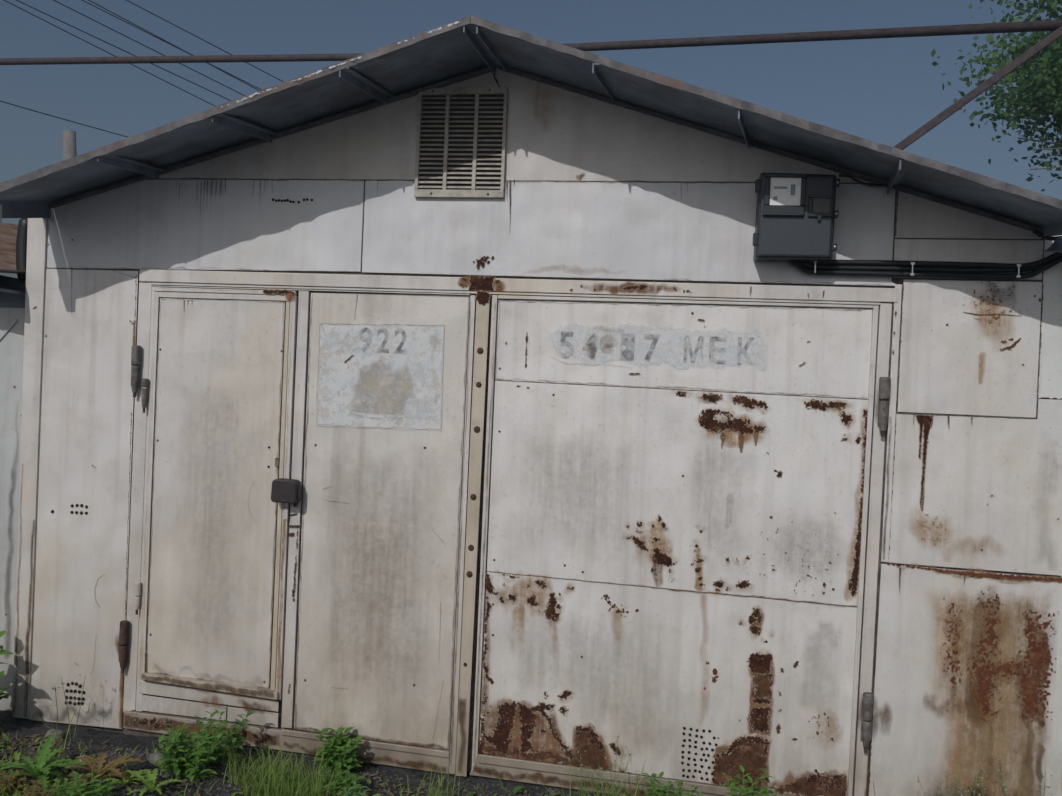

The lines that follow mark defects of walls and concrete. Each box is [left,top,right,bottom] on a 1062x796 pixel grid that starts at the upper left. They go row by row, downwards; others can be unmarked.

peeling [318,324,444,429]
rust [459,256,504,306]
rust [676,391,769,455]
rust [778,399,868,607]
rust [963,279,1021,327]
rust [459,573,672,796]
rust [626,514,847,796]
rust [887,564,1062,796]